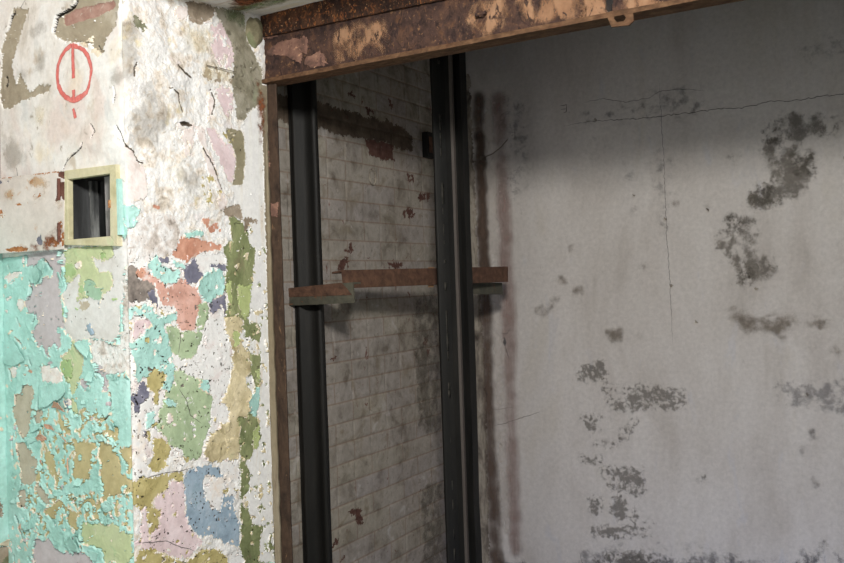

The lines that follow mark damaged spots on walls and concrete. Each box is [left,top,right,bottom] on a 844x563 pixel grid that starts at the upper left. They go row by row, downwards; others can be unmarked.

corrosion [263,35,328,68]
damp [749,112,825,206]
peeling [0,0,275,563]
crack [568,87,843,337]
damp [720,219,771,283]